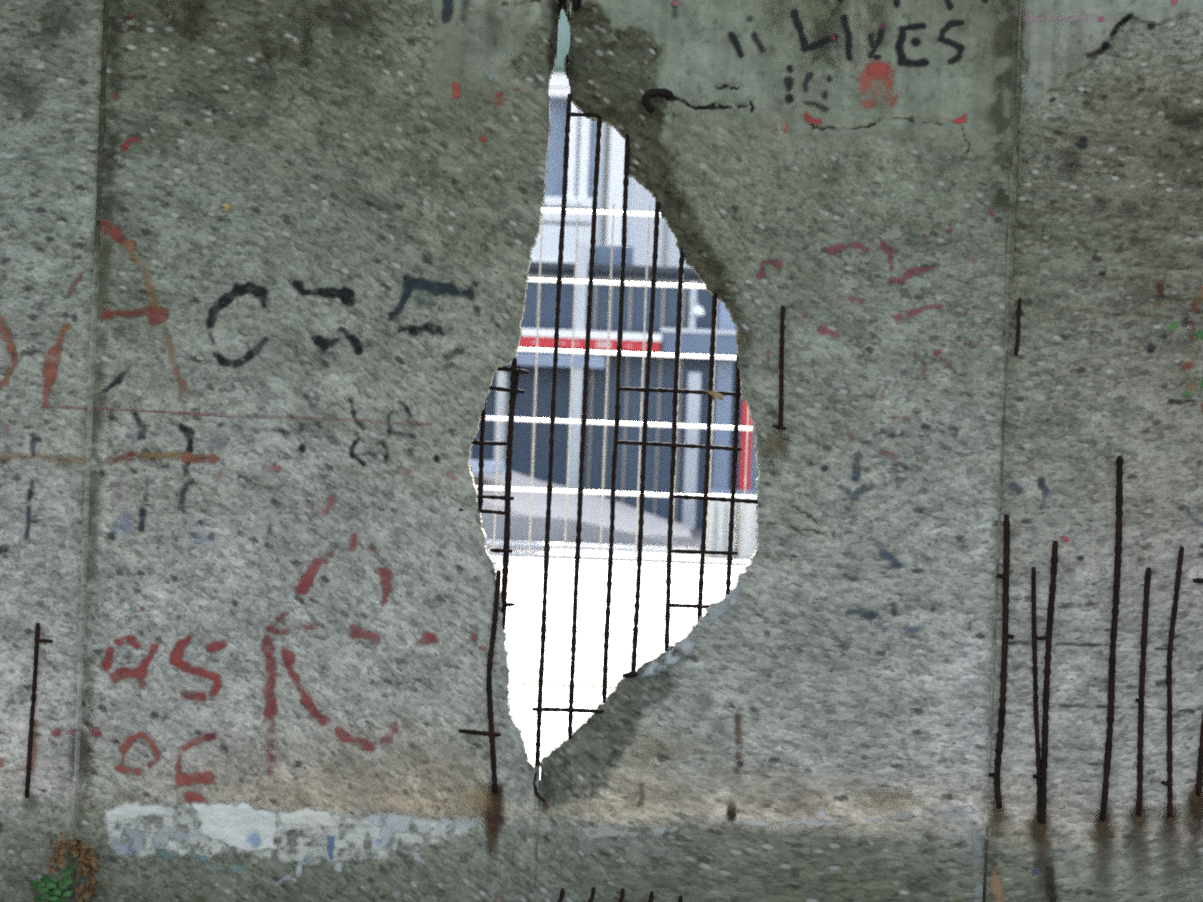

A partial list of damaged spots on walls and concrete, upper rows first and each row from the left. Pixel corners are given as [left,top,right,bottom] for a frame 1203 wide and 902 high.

crack [666,84,754,112]
crack [813,117,926,130]
spalling [1028,19,1203,147]
spalling [1014,298,1022,356]
spalling [459,0,758,810]
corrosion [735,714,743,773]
corrosion [485,787,503,848]
corrosion [1129,812,1145,854]
corrosion [1188,791,1203,838]